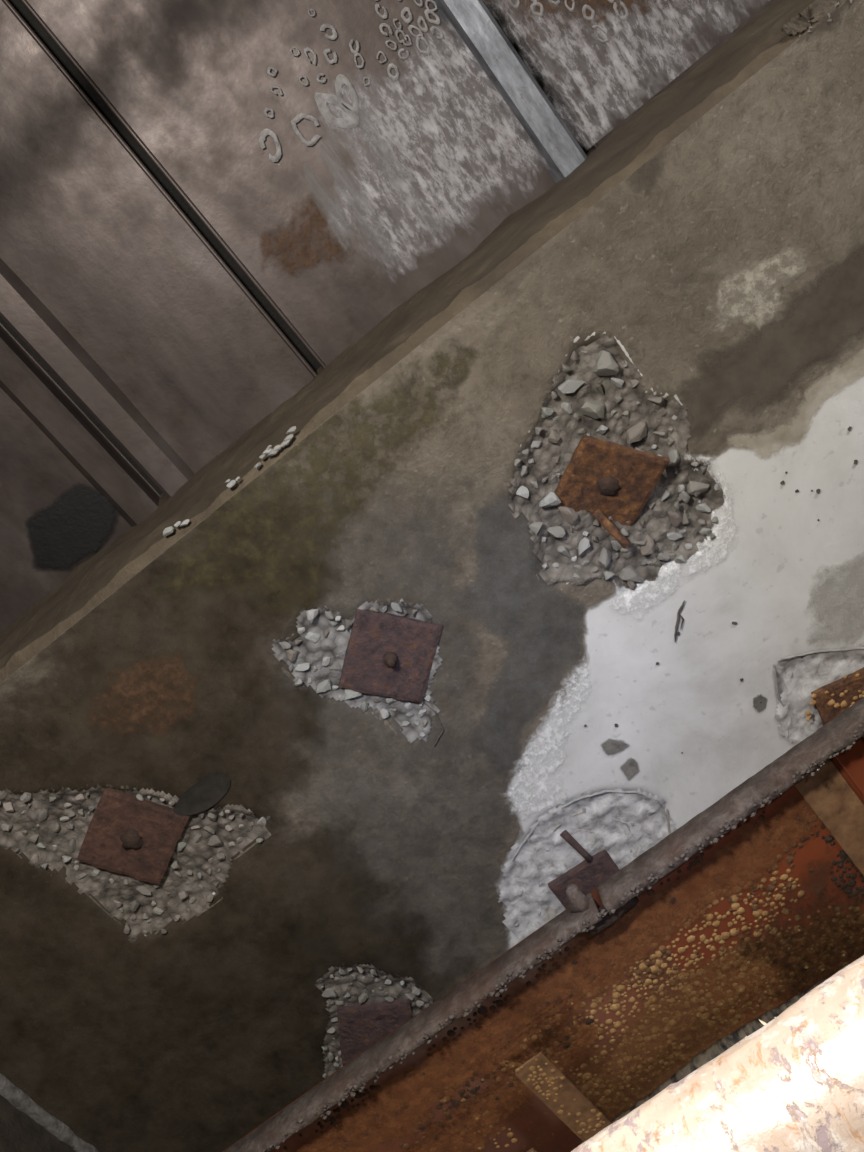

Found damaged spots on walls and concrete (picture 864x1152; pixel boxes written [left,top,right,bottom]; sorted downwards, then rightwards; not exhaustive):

leakage [290,0,444,146]
leakage [254,426,296,469]
spalling [508,334,726,590]
leakage [685,456,737,575]
leakage [610,553,684,618]
spalling [272,601,442,743]
spalling [773,644,864,745]
corrosion [805,674,864,721]
leakage [601,739,639,780]
spalling [0,785,271,943]
spalling [498,788,677,943]
spalling [315,964,434,1079]